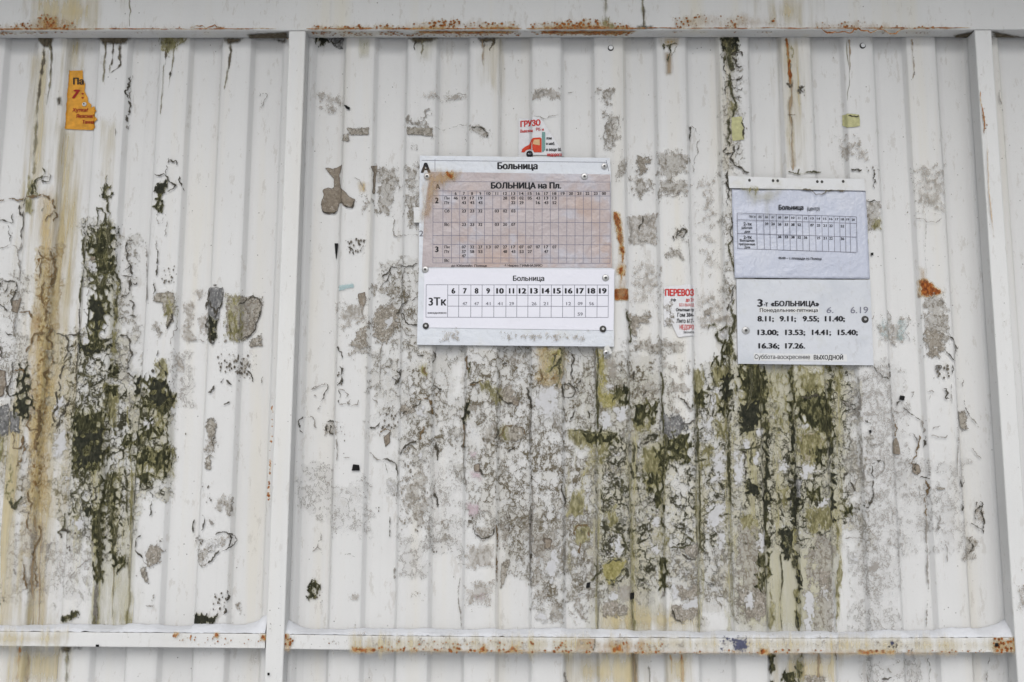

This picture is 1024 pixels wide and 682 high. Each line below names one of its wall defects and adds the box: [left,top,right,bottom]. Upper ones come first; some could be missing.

rust [306,14,748,38]
peeling [321,92,489,237]
rust [20,213,65,614]
water stain [110,281,120,361]
peeling [152,284,264,418]
peeling [336,281,405,447]
peeling [458,400,591,625]
rust [613,212,628,300]
water stain [759,367,775,629]
water stain [786,367,803,631]
water stain [826,366,843,627]
rust [917,278,941,298]